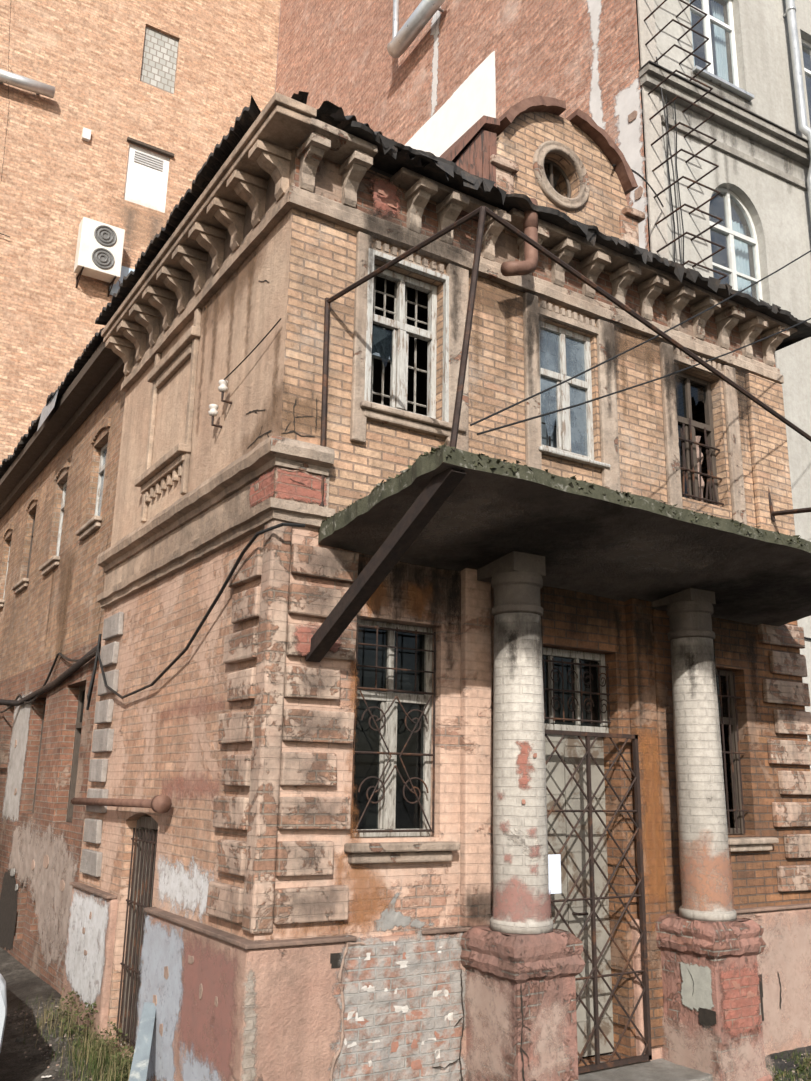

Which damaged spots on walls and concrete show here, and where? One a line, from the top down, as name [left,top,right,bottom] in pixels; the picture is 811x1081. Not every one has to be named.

flaking render [615,78,647,249]
damp [418,491,595,567]
peeling [516,741,537,804]
flaking render [8,819,109,1010]
peeling [136,857,257,1081]
flaking render [329,929,512,1081]
flaking render [532,1005,566,1078]
flaking render [662,916,811,1081]